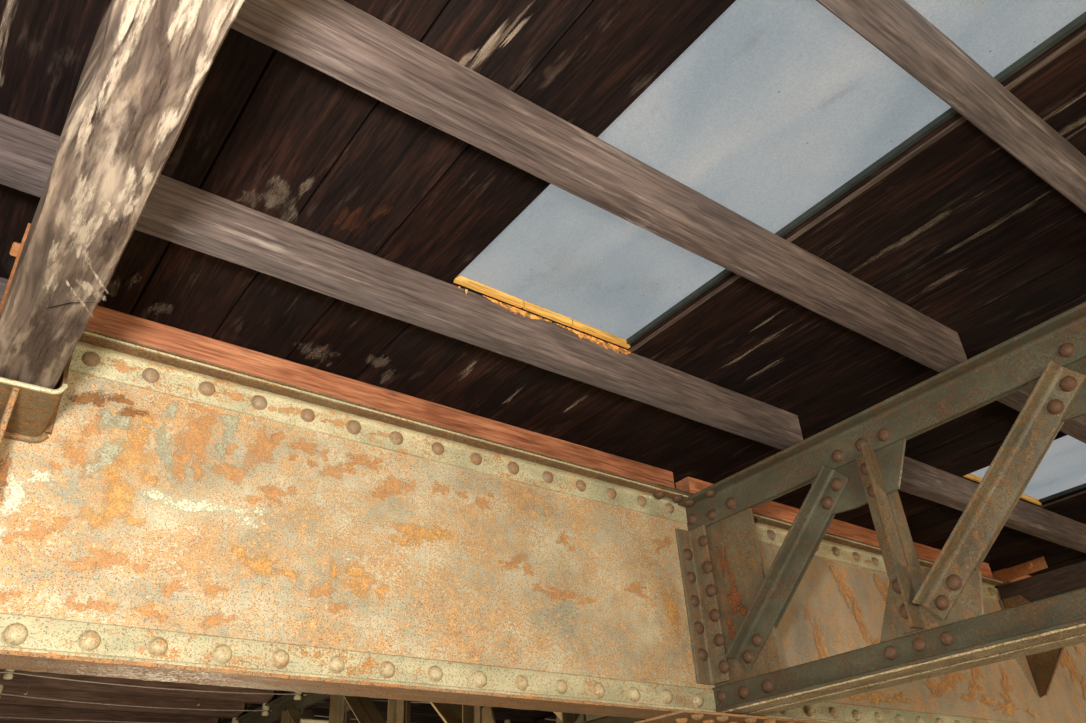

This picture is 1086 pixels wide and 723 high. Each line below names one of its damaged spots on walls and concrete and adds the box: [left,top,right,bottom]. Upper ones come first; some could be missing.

rust [79,333,688,501]
rust [0,391,415,544]
rust [390,523,452,546]
rust [753,515,791,531]
rust [66,593,118,613]
rust [61,548,148,573]
rust [161,581,187,597]
rust [231,544,300,579]
rust [310,558,389,613]
rust [499,554,594,604]
rust [823,535,889,596]
rust [925,666,1037,717]